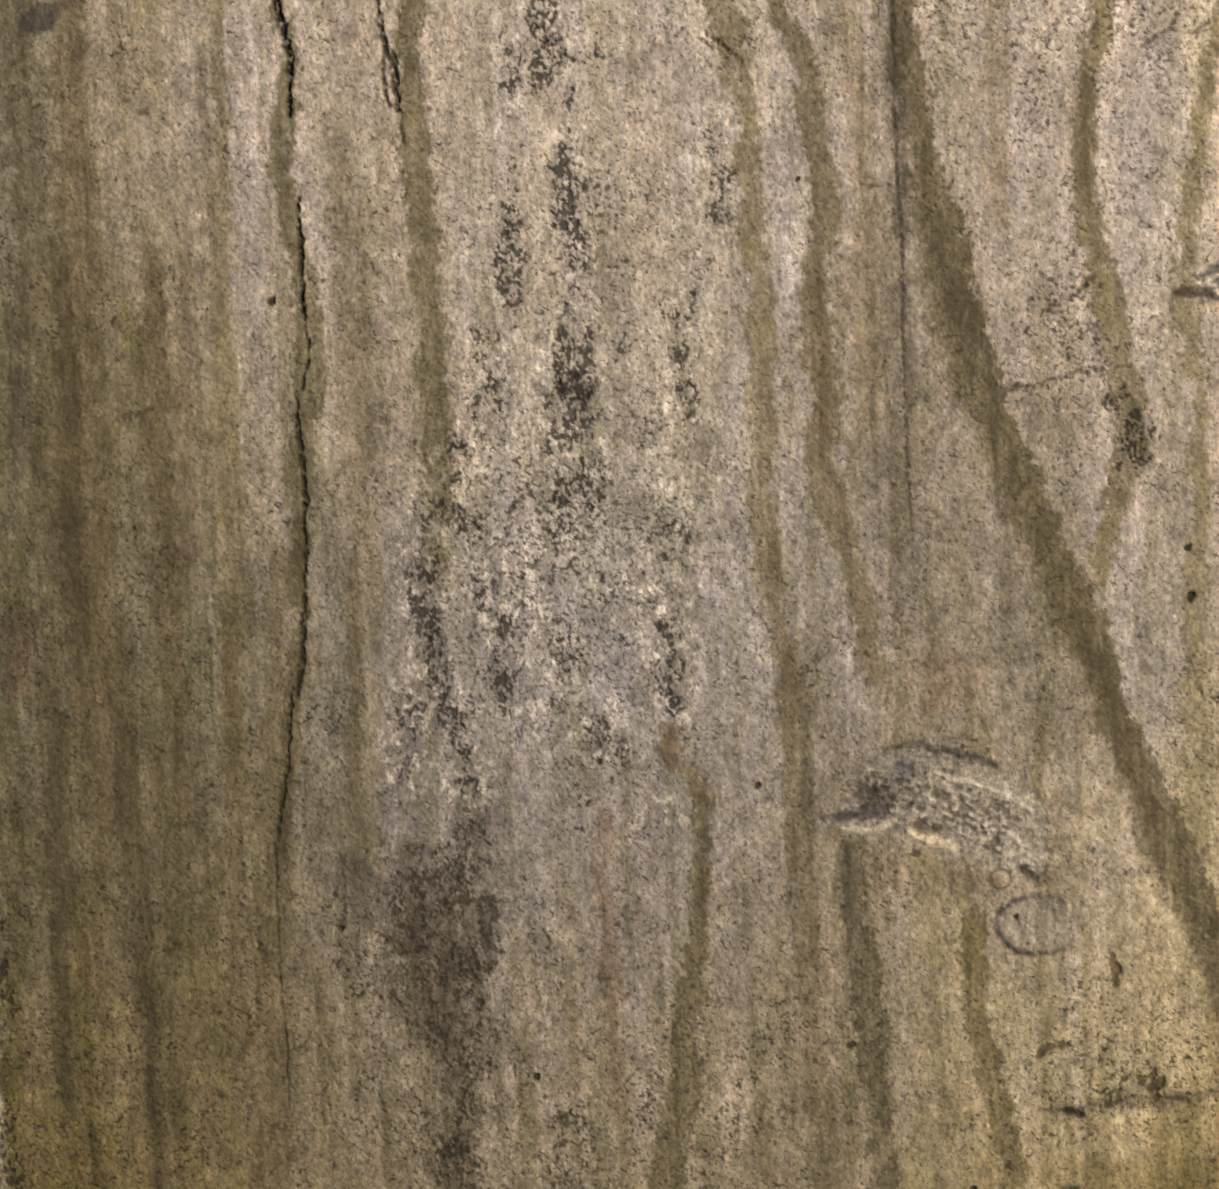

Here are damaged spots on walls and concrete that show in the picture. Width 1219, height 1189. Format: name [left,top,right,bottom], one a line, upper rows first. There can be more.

crack [270,0,295,119]
crack [370,0,413,146]
spalling [1169,259,1219,314]
damp [0,0,392,1189]
crack [271,195,311,1106]
damp [601,0,1219,1189]
spalling [799,734,1063,890]